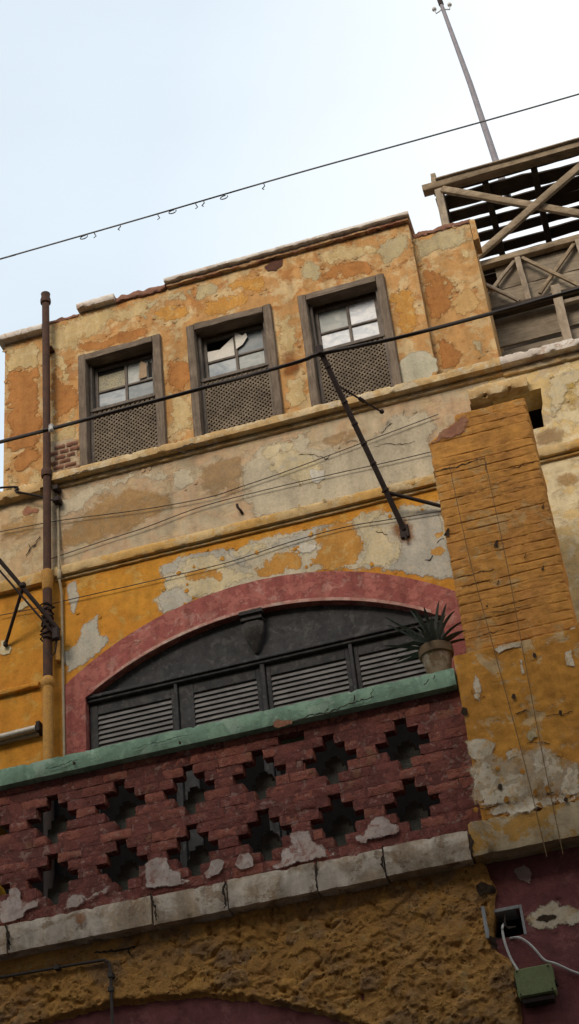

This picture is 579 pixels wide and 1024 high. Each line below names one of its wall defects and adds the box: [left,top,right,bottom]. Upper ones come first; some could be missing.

peeling [299,226,472,338]
peeling [2,259,283,486]
flaking render [56,410,468,546]
crack [433,458,536,495]
flaking render [154,500,453,614]
flaking render [62,580,109,672]
peeling [465,727,579,815]
crack [220,877,228,909]
peeling [526,894,579,933]